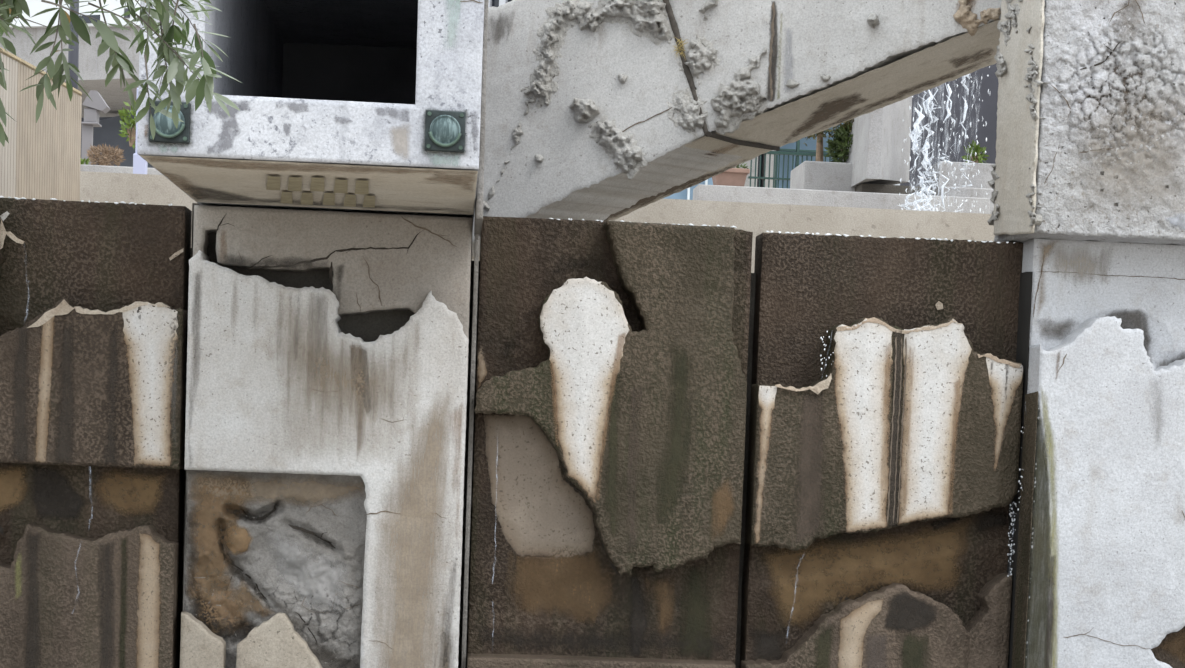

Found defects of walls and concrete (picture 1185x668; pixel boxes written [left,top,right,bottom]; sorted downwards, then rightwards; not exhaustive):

crack [768,2,776,101]
crack [1080,1,1145,70]
crack [622,107,672,132]
spalling [27,300,170,328]
spalling [169,205,472,339]
crack [217,216,457,312]
spalling [1109,311,1150,351]
water stain [308,347,375,442]
spalling [775,374,832,394]
spalling [183,470,367,668]
water stain [188,475,363,640]
water stain [385,411,449,668]